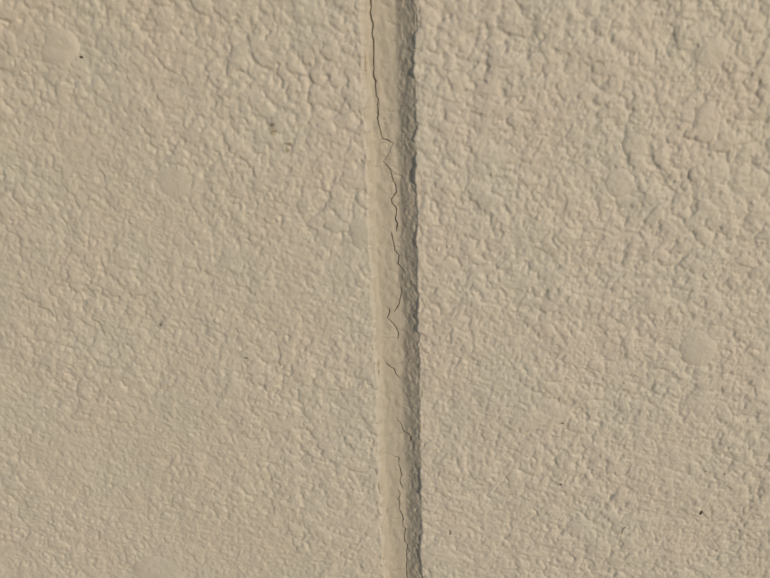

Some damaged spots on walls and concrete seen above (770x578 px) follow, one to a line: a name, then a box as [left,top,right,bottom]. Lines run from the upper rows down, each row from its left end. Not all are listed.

crack [370,0,413,336]